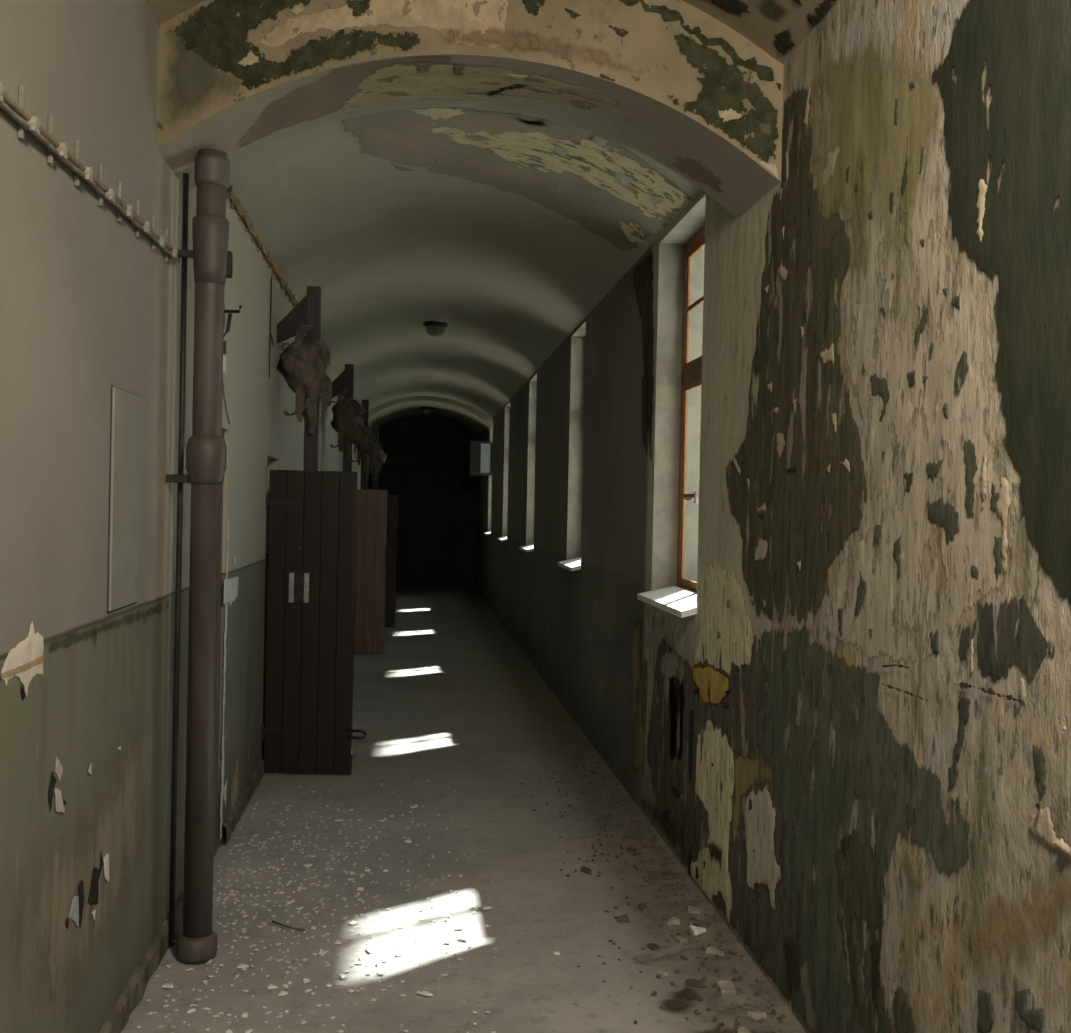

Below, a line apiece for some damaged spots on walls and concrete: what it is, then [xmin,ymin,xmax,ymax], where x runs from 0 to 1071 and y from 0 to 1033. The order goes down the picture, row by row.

peeling [260,0,509,48]
peeling [343,63,694,246]
peeling [655,88,1009,767]
peeling [1,620,45,699]
leakage [50,604,161,651]
peeling [49,756,67,813]
peeling [688,720,781,923]
peeling [1029,803,1071,859]
leakage [19,745,137,996]
flaking render [65,851,109,929]
peeling [977,990,994,1033]
peeling [1014,989,1043,1033]